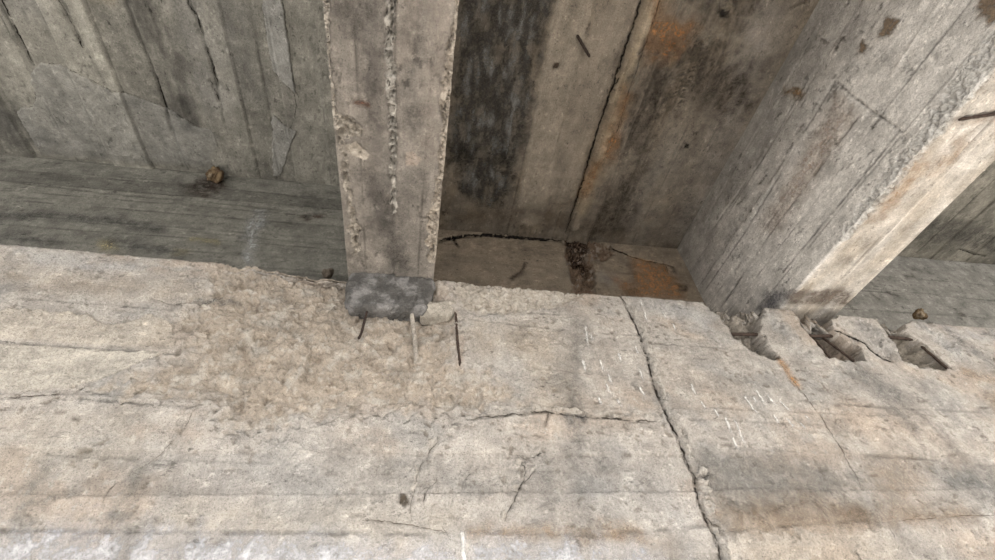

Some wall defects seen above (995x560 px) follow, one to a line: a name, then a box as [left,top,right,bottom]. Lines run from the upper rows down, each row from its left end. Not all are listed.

spalling [424,0,459,264]
water stain [447,0,553,207]
crack [440,0,660,246]
spalling [0,239,617,443]
crack [479,296,731,560]
crack [594,243,669,272]
spalling [708,307,781,360]
spalling [792,310,866,363]
spalling [876,319,952,371]